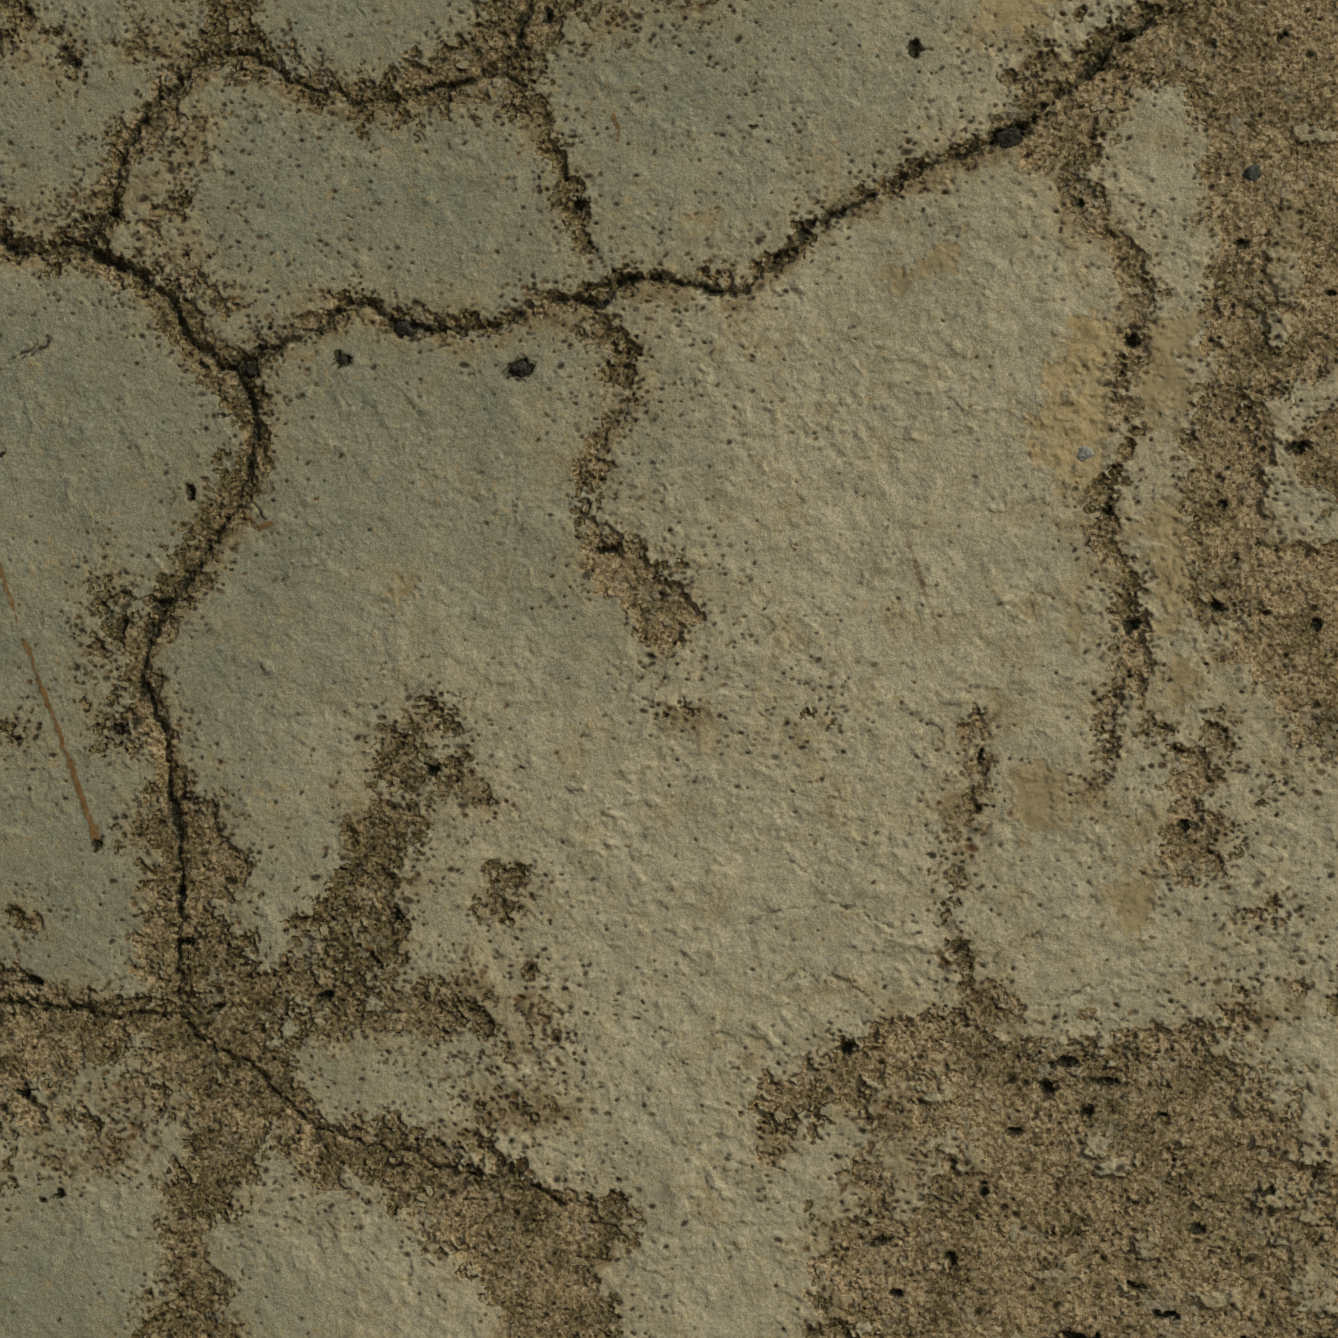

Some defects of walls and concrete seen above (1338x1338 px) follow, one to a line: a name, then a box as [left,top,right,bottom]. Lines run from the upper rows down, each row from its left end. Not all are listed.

flaking render [346,0,719,263]
corrosion [0,563,101,846]
crack [0,0,1171,1206]
flaking render [569,308,707,656]
flaking render [798,703,834,732]
flaking render [944,702,1001,845]
flaking render [1013,0,1338,947]
flaking render [0,690,647,1338]
flaking render [738,862,1338,1338]